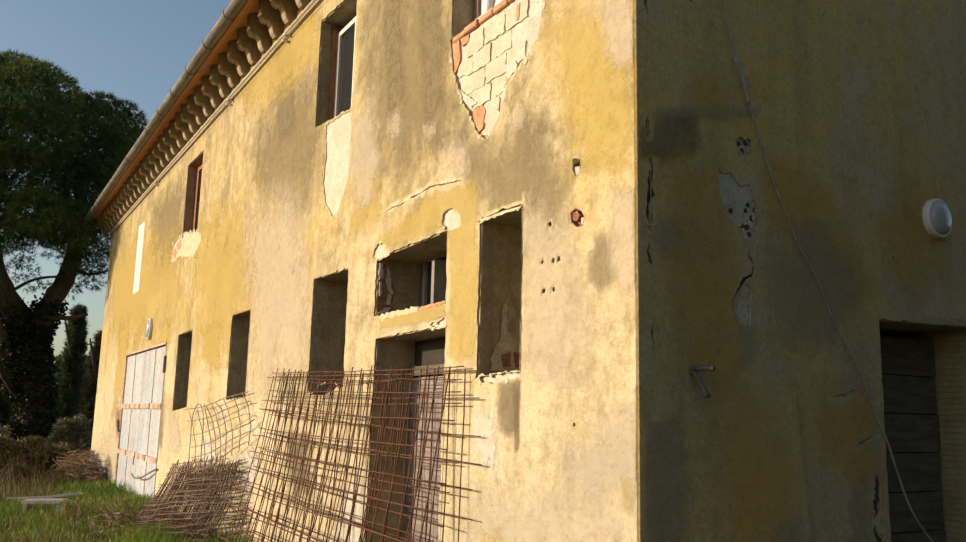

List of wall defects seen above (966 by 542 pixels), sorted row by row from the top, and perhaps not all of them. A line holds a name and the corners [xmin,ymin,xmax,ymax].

spalling [448,0,546,158]
peeling [323,107,352,219]
spalling [170,228,201,265]
peeling [371,239,446,322]
spalling [438,208,460,232]
spalling [570,207,585,227]
crack [643,0,656,416]
spalling [717,168,758,246]
spalling [429,317,447,331]
spalling [478,303,521,385]
damp [474,381,518,466]